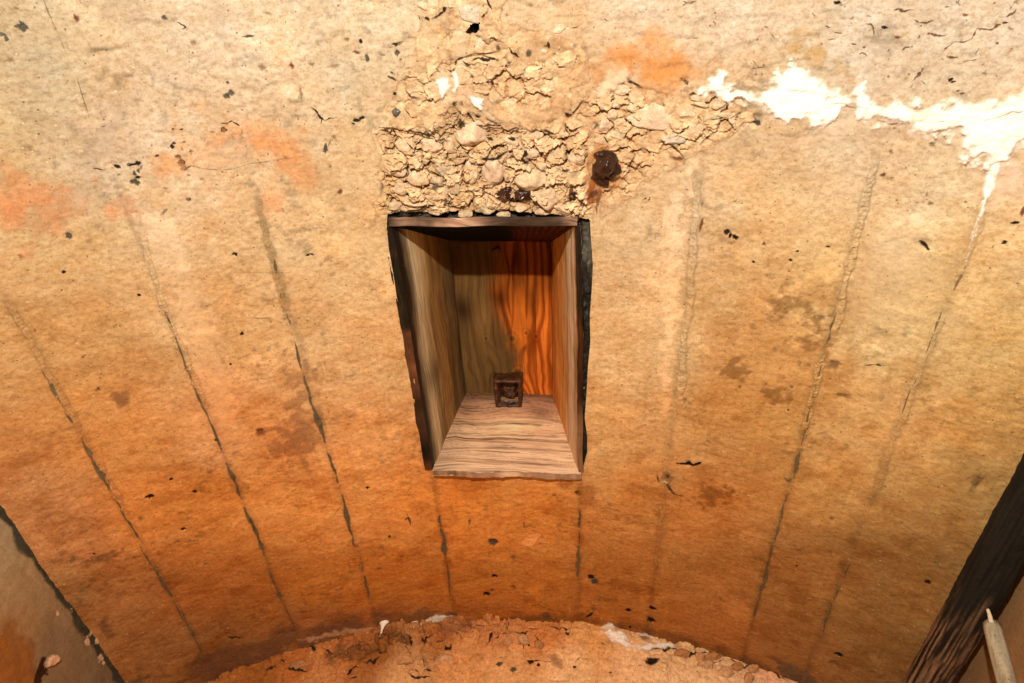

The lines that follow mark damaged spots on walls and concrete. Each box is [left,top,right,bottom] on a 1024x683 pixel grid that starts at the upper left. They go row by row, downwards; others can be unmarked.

spalling [371,0,755,424]
leakage [698,57,1024,261]
crack [42,372,201,652]
crack [165,314,294,624]
crack [256,260,370,600]
crack [753,368,821,621]
crack [821,564,850,636]